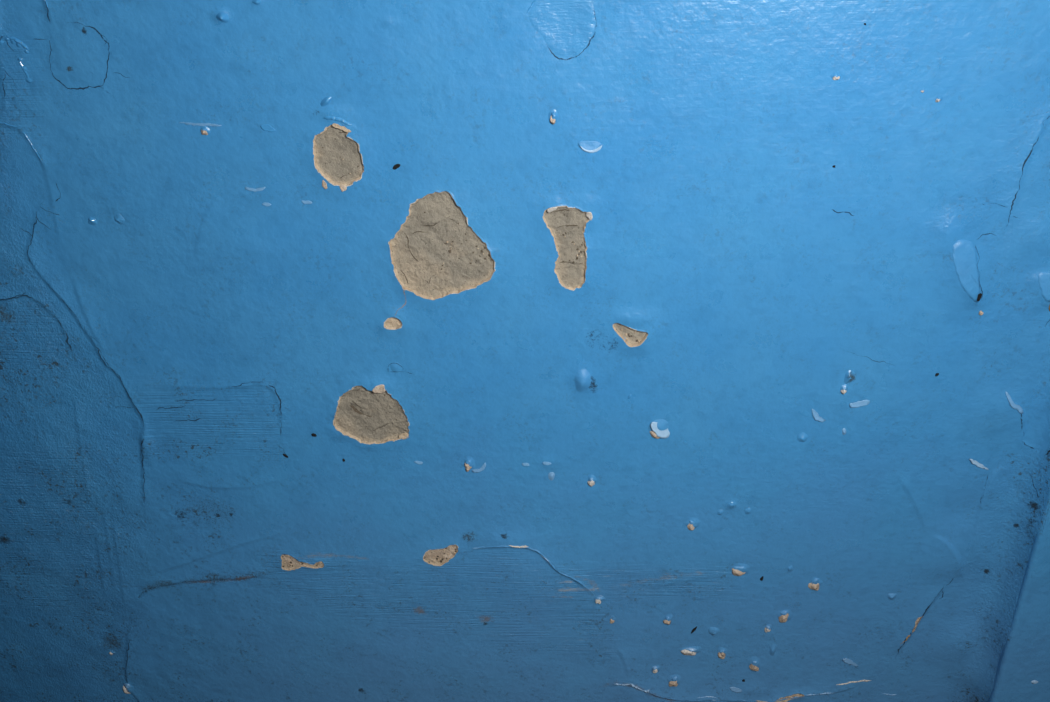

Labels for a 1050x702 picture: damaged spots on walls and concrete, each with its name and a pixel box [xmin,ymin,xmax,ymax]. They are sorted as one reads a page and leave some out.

crack [37,6,128,90]
peeling [311,116,366,192]
crack [978,118,1048,239]
crack [20,184,61,259]
peeling [387,189,497,302]
peeling [541,204,593,292]
peeling [611,322,650,348]
crack [0,284,243,495]
peeling [332,384,411,445]
peeling [279,553,326,571]
peeling [421,544,460,567]